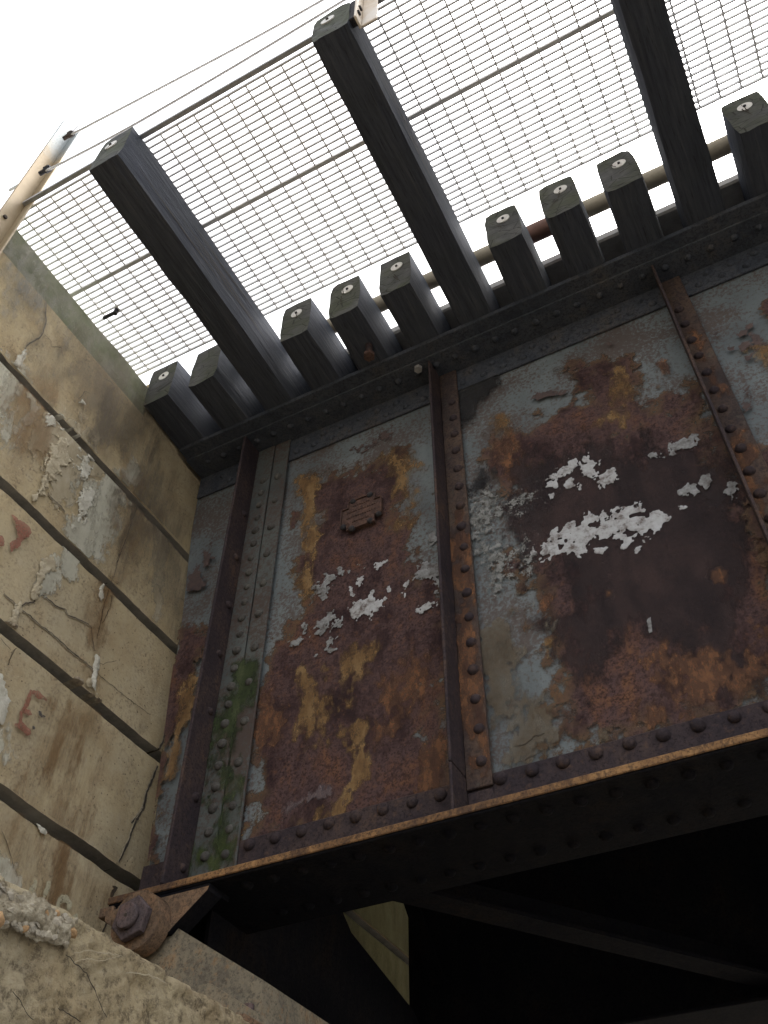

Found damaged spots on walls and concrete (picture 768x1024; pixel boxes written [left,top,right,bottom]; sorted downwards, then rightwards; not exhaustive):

spalling [9,553,65,625]
peeling [27,399,105,511]
crack [3,508,166,898]
corrosion [147,621,208,865]
damp [207,658,259,774]
corrosion [240,425,449,841]
peeling [287,561,439,657]
corrosion [450,510,490,777]
peeling [468,452,712,600]
corrosion [475,352,768,760]
peeling [648,433,701,458]
peeling [723,481,739,499]